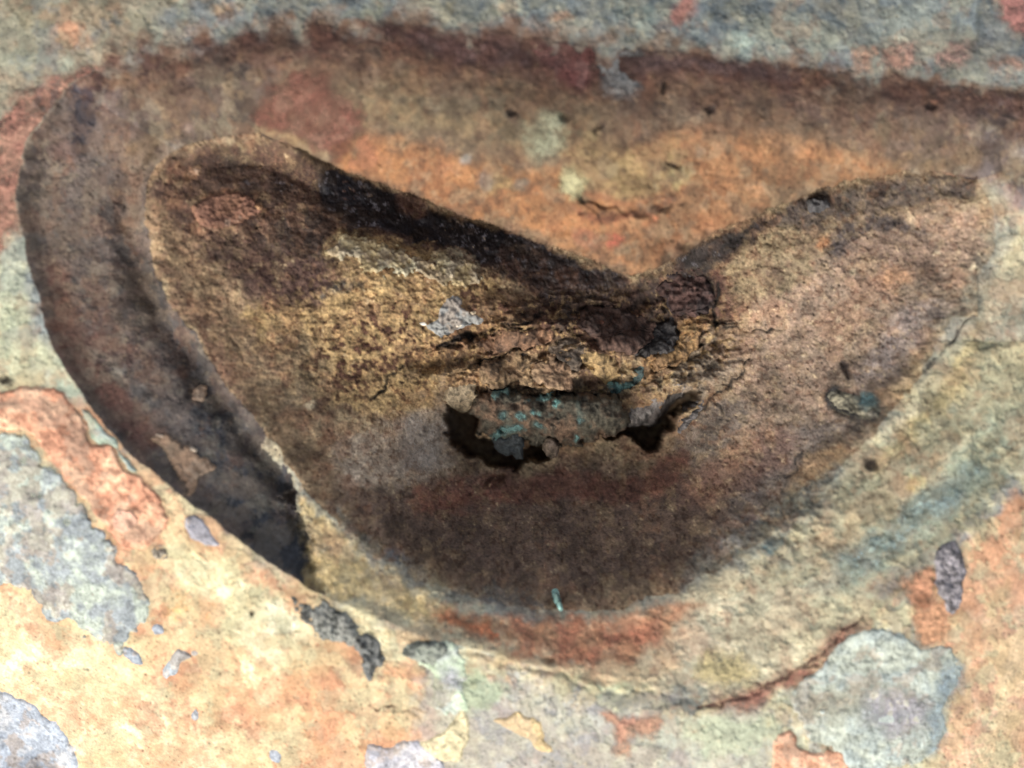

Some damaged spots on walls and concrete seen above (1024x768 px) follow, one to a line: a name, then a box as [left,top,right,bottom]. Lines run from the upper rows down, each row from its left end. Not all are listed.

rust [410,31,596,89]
damp [597,49,642,97]
rust [256,71,375,159]
damp [534,116,564,154]
damp [562,174,583,196]
damp [607,366,644,394]
peeling [81,408,137,472]
peeling [0,432,164,665]
peeling [185,515,219,546]
damp [842,489,960,568]
damp [551,588,563,611]